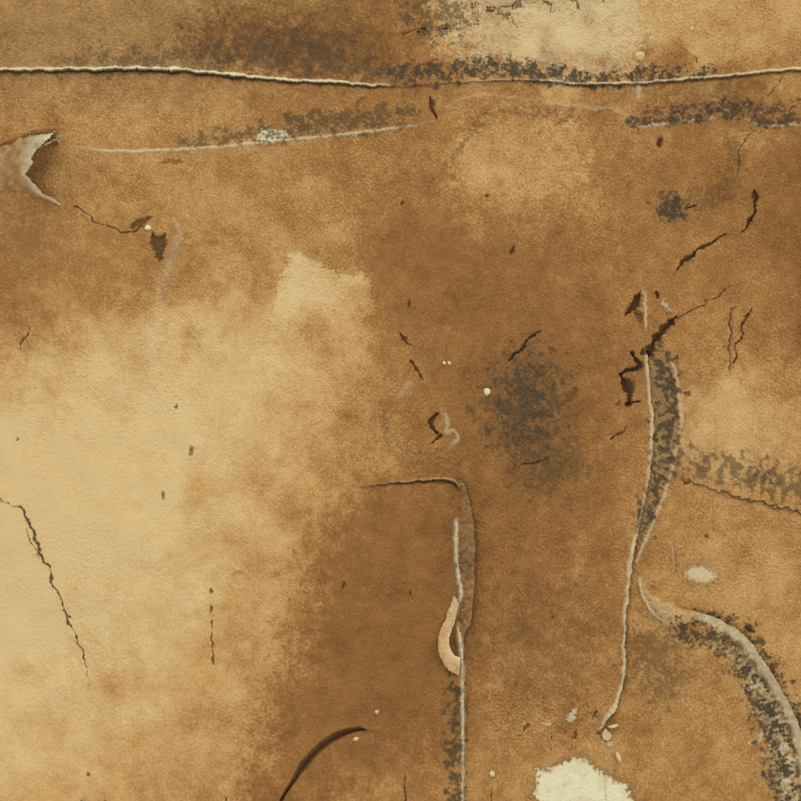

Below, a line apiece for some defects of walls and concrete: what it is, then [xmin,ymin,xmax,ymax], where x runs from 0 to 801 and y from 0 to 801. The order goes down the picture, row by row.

peeling [0,129,61,205]
peeling [0,65,394,89]
peeling [71,123,424,168]
crack [427,96,439,120]
crack [676,132,763,273]
crack [609,285,753,441]
crack [0,496,91,686]
peeling [366,339,801,801]
crack [278,726,374,801]